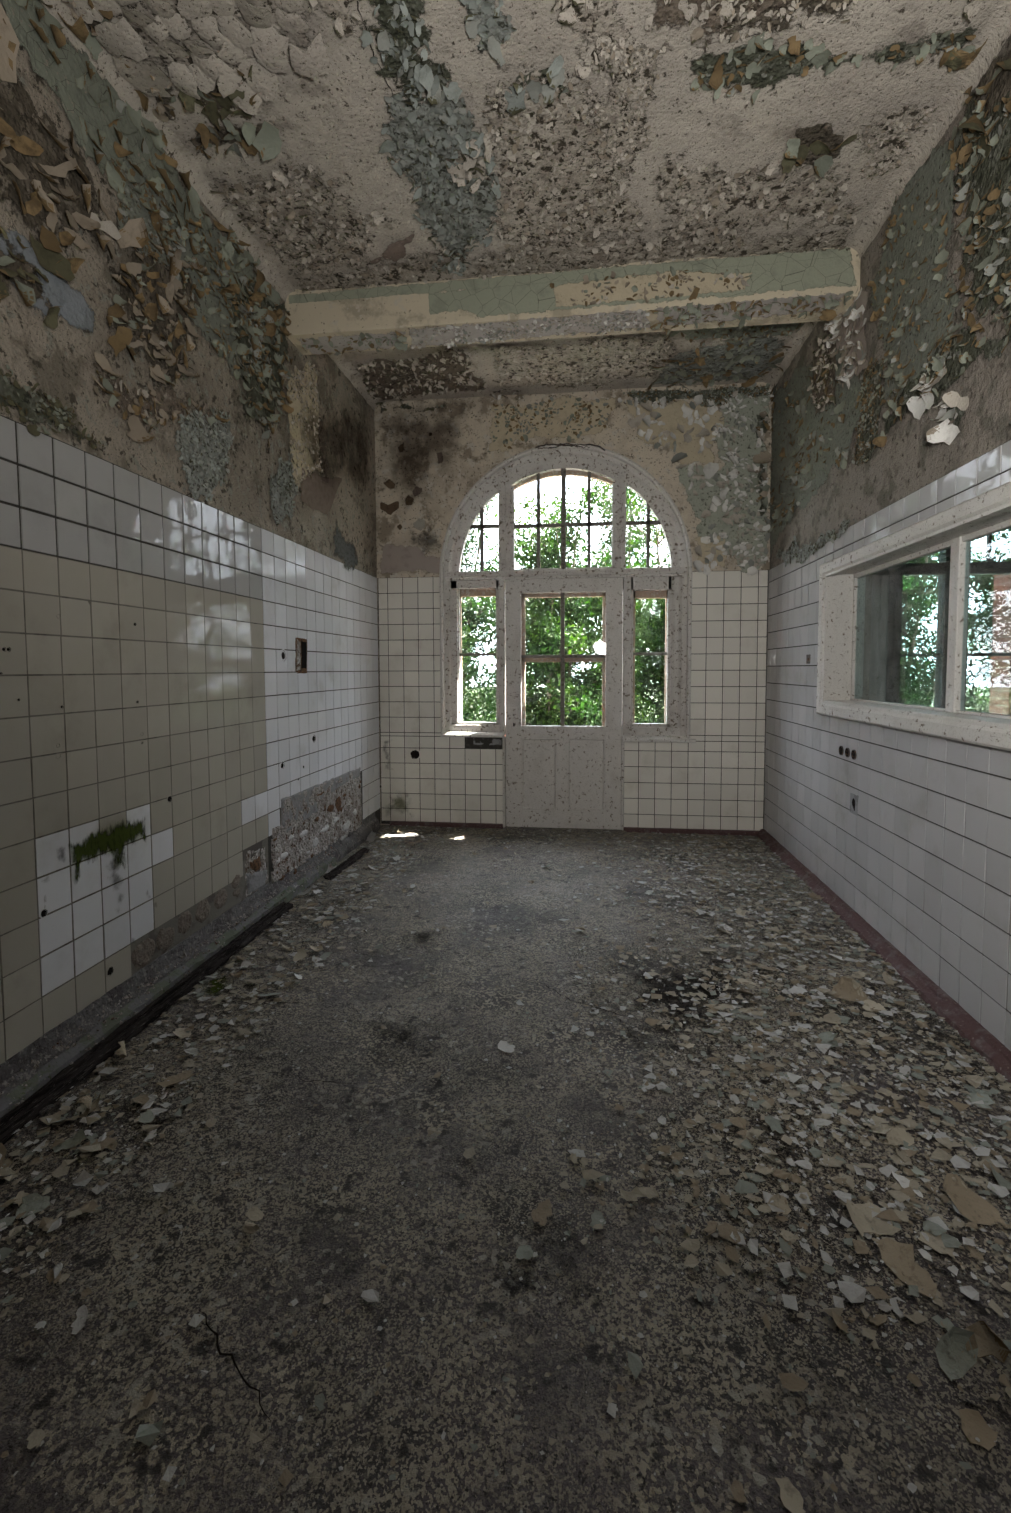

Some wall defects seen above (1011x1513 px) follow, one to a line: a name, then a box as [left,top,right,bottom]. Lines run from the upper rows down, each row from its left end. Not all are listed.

peeling [0,0,1011,575]
flaking render [245,767,412,919]